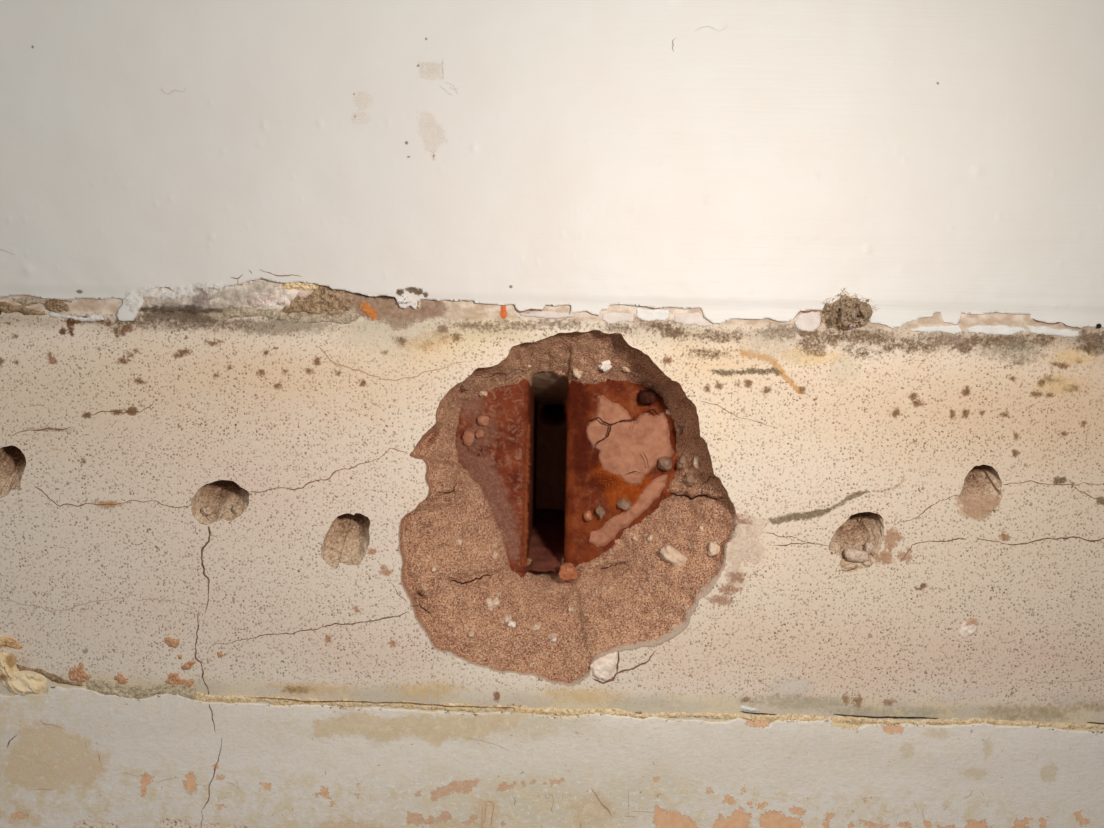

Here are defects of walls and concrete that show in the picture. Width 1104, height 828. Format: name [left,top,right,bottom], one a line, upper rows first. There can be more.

leakage [59,314,268,346]
peeling [143,279,359,324]
leakage [351,292,581,347]
leakage [606,320,805,394]
leakage [757,324,1104,397]
peeling [910,325,1080,337]
crack [250,448,407,493]
spalling [398,307,765,687]
crack [769,533,828,546]
crack [901,495,1104,560]
crack [0,487,408,823]
peeling [706,785,807,828]